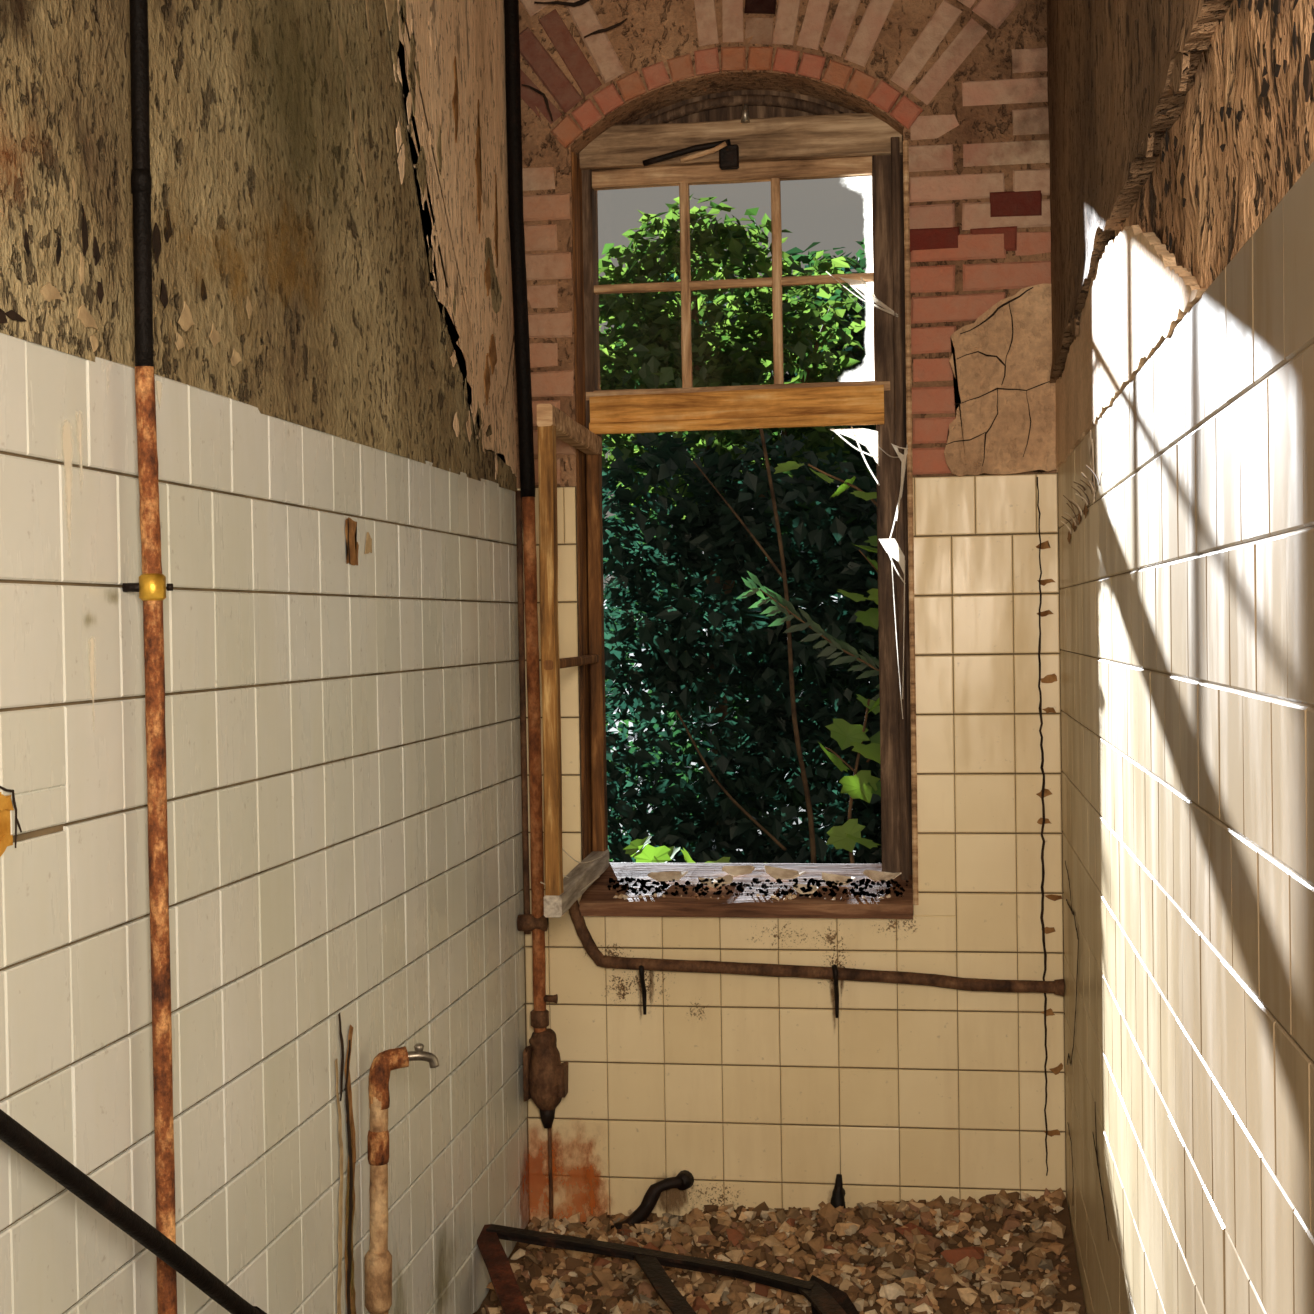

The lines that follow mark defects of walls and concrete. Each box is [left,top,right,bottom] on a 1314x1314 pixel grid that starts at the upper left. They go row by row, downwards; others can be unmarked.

spalling [584,18,627,38]
spalling [522,84,553,121]
peeling [1047,0,1314,544]
crack [944,284,1056,477]
peeling [0,786,22,857]
corrosion [522,1140,606,1222]